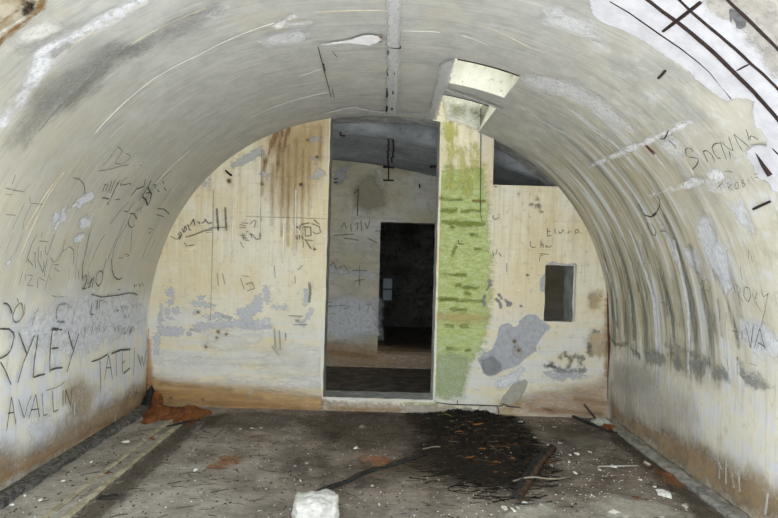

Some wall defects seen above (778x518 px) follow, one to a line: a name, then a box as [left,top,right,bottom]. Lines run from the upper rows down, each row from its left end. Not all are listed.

water stain [16,0,148,102]
crack [318,47,337,96]
peeling [322,35,382,46]
spalling [589,0,778,192]
corrosion [264,128,290,169]
water stain [439,95,487,237]
water stain [23,296,145,349]
peeling [153,285,287,356]
peeling [466,314,550,413]
water stain [544,214,732,387]
water stain [734,320,778,390]
corrosion [0,352,324,488]